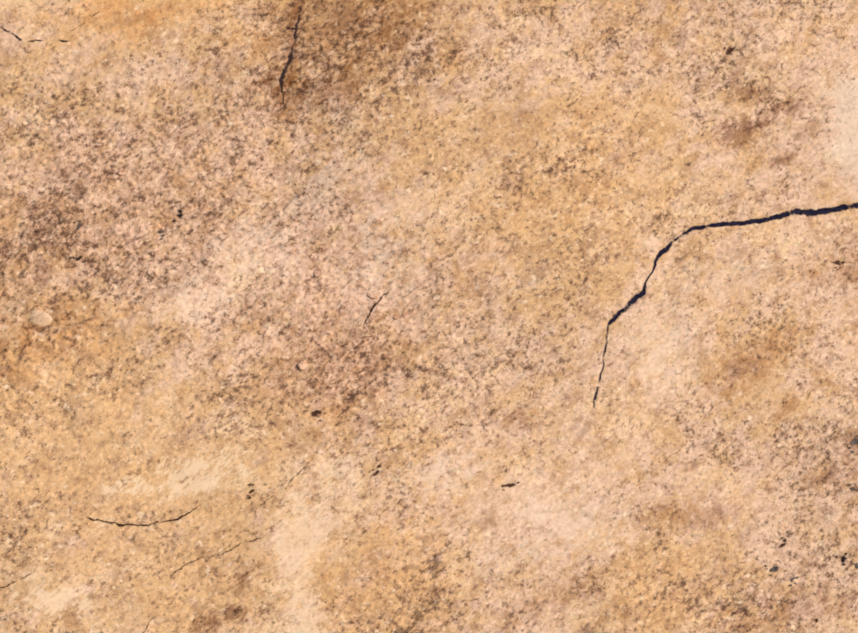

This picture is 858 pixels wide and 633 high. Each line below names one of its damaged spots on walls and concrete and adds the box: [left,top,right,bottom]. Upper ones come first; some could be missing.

crack [271,6,302,104]
crack [593,202,858,458]